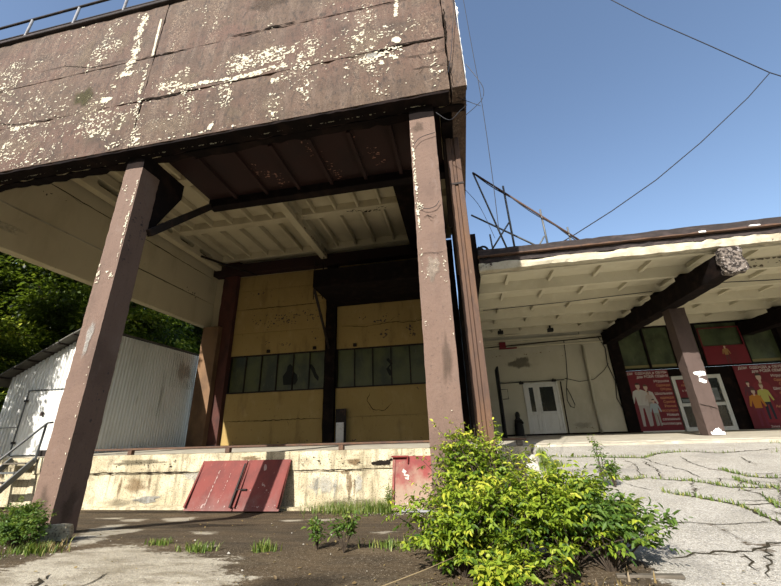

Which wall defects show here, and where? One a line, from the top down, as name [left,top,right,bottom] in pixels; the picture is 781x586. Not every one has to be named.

crack [143,88,196,100]
peeling [0,0,420,169]
peeling [410,128,423,230]
crack [611,448,781,575]